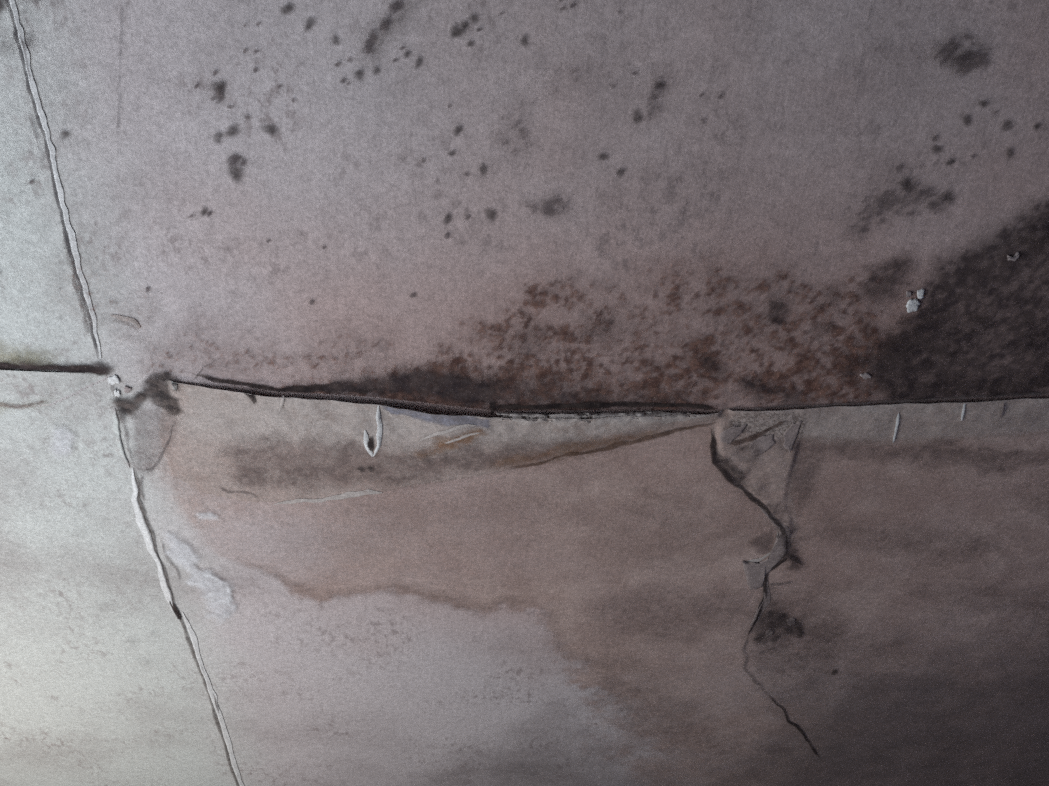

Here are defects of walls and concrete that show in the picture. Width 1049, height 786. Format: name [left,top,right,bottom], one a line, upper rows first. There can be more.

leakage [210,71,231,109]
leakage [362,0,402,54]
leakage [452,15,481,47]
leakage [934,35,988,78]
leakage [228,154,245,180]
leakage [851,166,952,240]
crack [0,0,244,786]
leakage [278,202,1049,786]
leakage [167,534,234,617]
crack [196,372,1039,757]